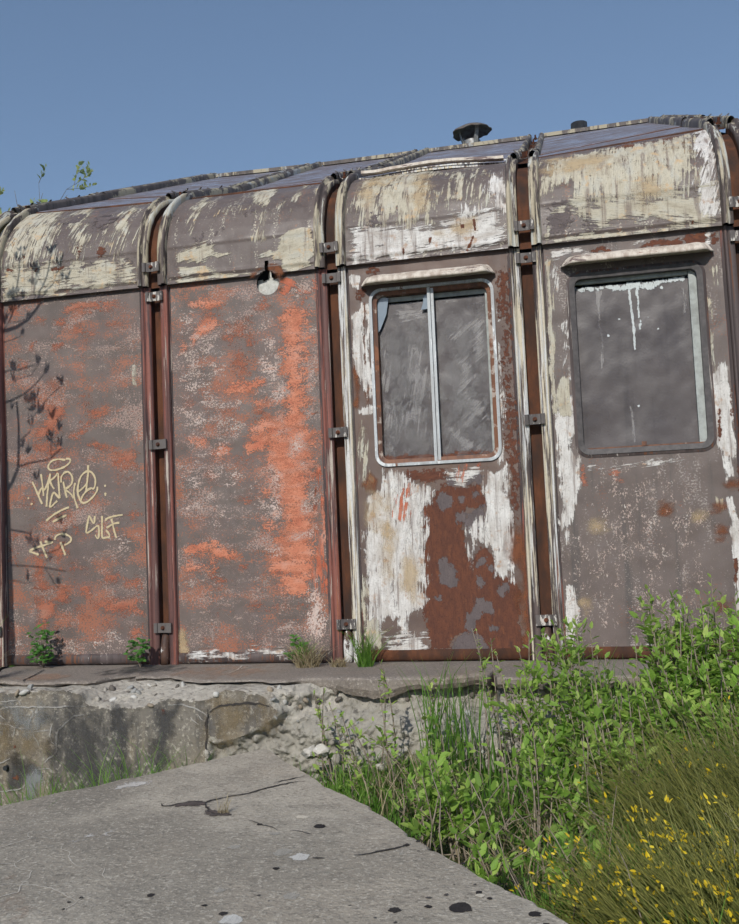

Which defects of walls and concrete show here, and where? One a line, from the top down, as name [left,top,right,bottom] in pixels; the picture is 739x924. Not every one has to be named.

peeling [345,168,507,290]
peeling [539,130,721,244]
peeling [1,203,150,481]
peeling [173,185,329,662]
peeling [351,302,435,650]
peeling [439,440,515,585]
peeling [545,258,739,647]
spalling [0,679,576,784]
spalling [587,685,657,745]
crack [161,776,310,834]